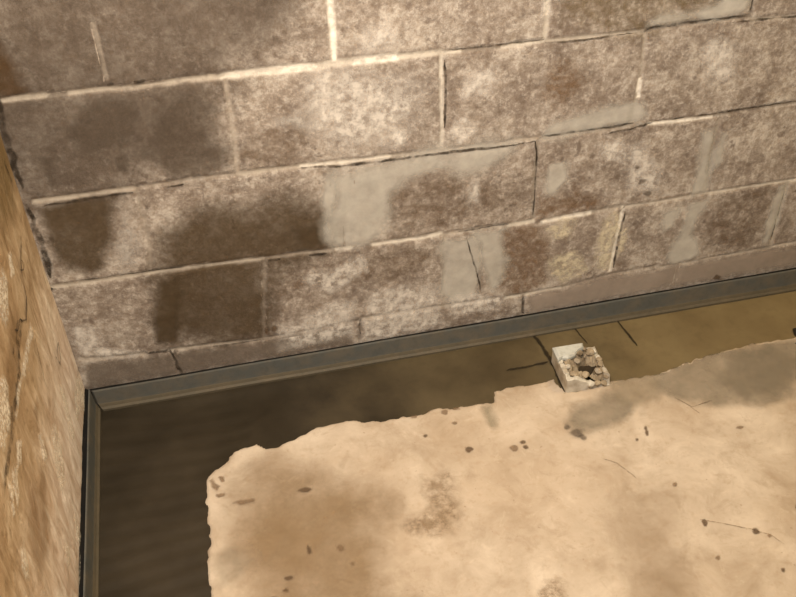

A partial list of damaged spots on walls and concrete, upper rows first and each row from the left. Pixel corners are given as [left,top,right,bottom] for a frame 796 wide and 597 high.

damp [45,200,110,270]
damp [156,182,335,342]
damp [75,328,124,357]